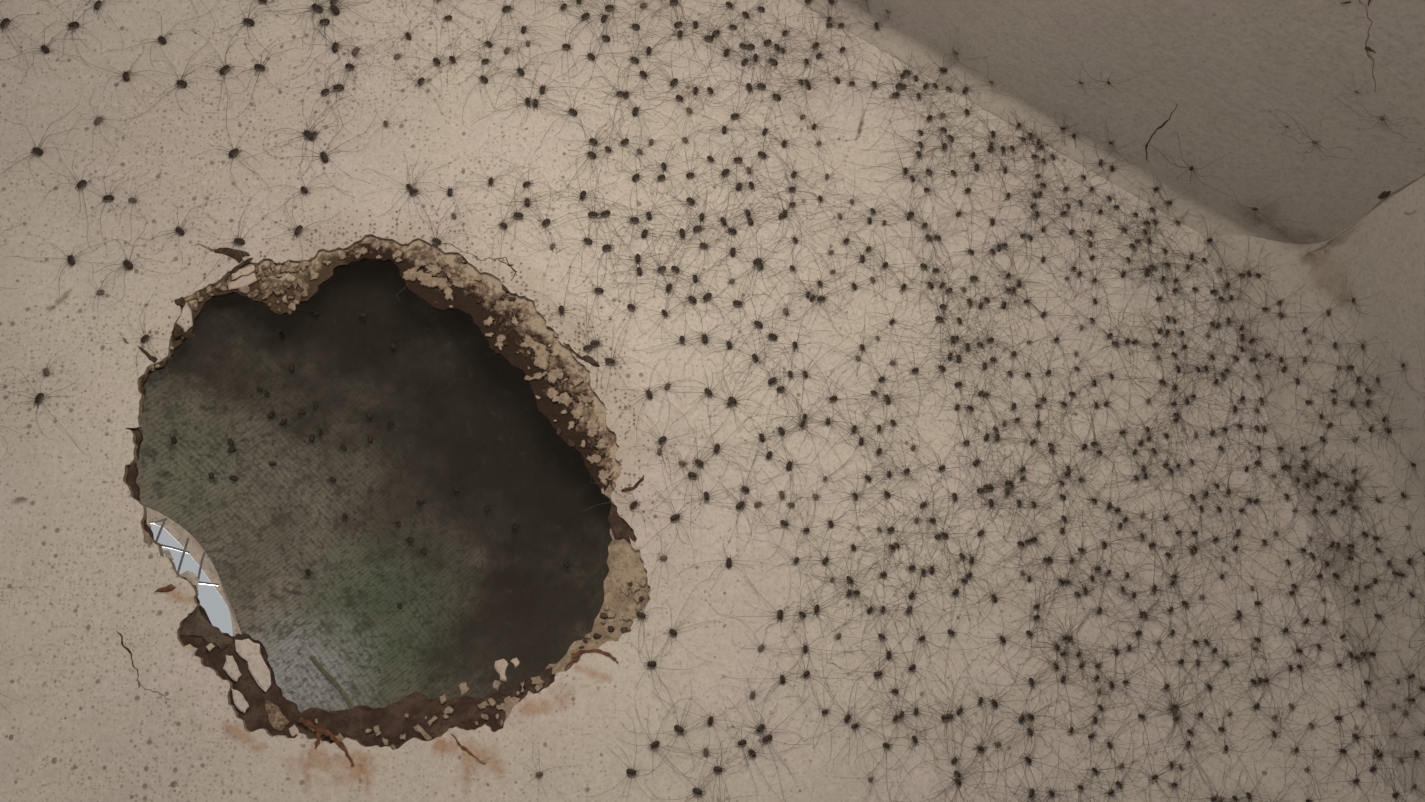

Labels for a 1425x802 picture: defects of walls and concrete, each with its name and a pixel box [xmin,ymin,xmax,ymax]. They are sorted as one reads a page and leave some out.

crack [1341,0,1376,93]
crack [1304,174,1425,257]
spalling [122,236,650,750]
crack [116,630,172,700]